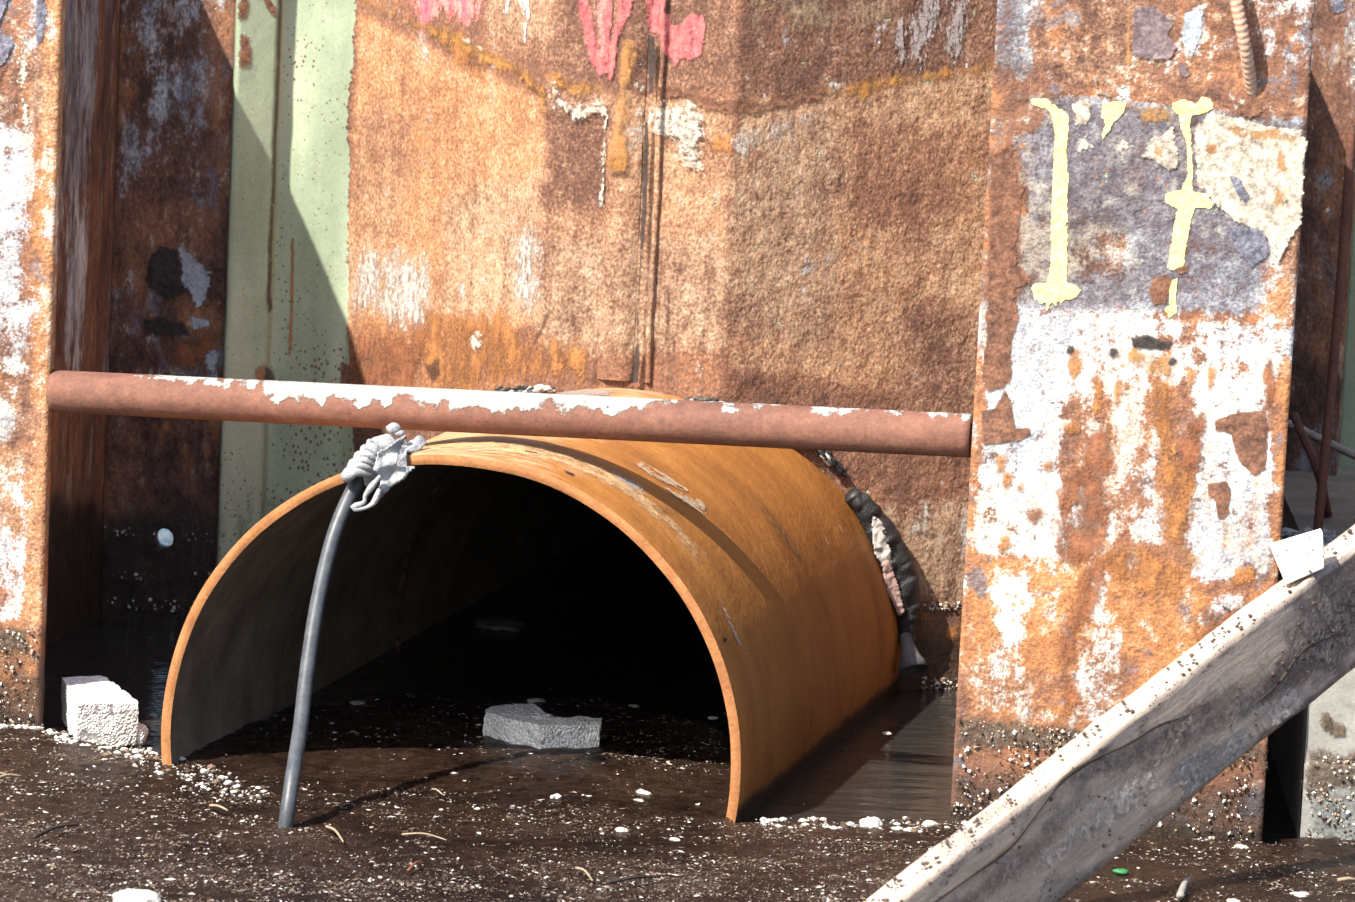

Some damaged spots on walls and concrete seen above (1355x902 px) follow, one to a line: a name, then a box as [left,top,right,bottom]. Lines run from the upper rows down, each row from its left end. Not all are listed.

peeling [0,0,47,130]
corrosion [1220,90,1262,118]
corrosion [237,0,282,312]
corrosion [143,301,215,371]
corrosion [255,366,275,380]
corrosion [340,302,588,390]
corrosion [981,143,1031,491]
corrosion [1149,265,1189,304]
corrosion [998,535,1011,552]
corrosion [1028,335,1276,715]